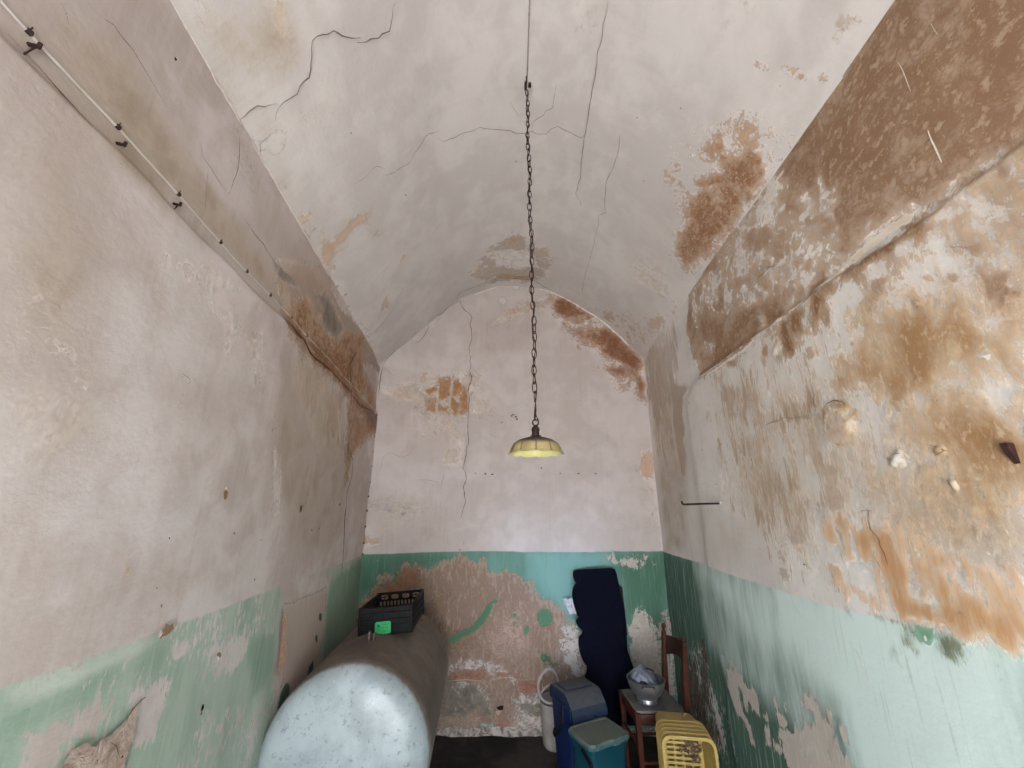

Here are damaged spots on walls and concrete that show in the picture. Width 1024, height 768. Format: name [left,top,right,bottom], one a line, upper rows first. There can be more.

leakage [316,286,346,337]
crack [289,5,620,567]
leakage [647,0,1024,582]
peeling [601,550,657,571]
spalling [61,697,145,768]
peeling [356,550,587,729]
peeling [627,606,723,761]
peeling [726,659,855,768]
leakage [939,634,962,663]